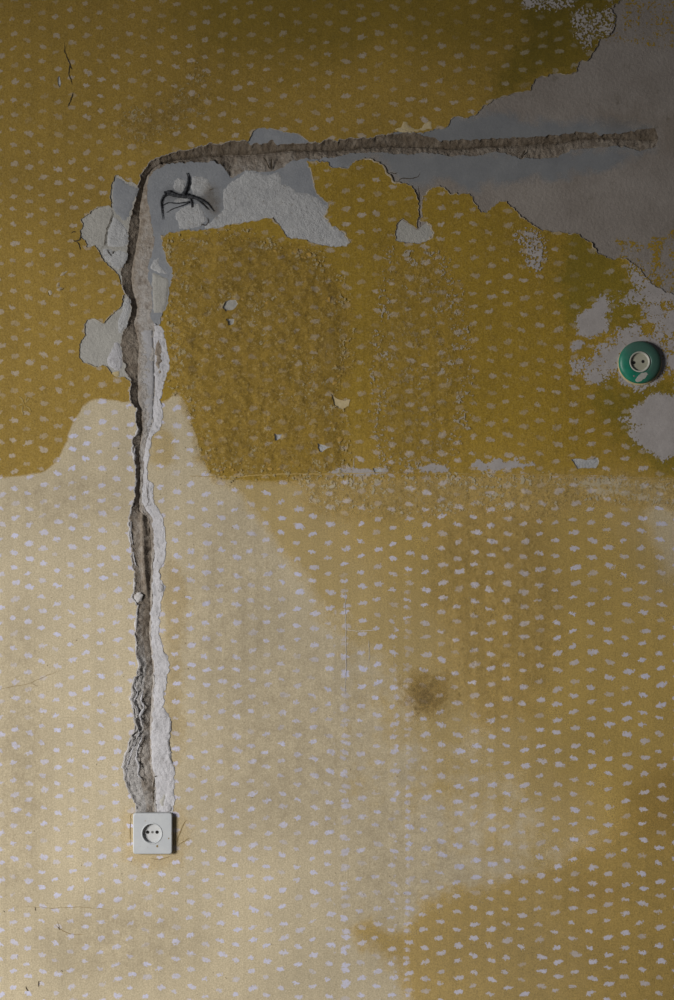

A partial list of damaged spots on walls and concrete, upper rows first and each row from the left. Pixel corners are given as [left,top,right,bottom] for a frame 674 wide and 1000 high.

peeling [79,0,674,519]
damp [159,159,674,1000]